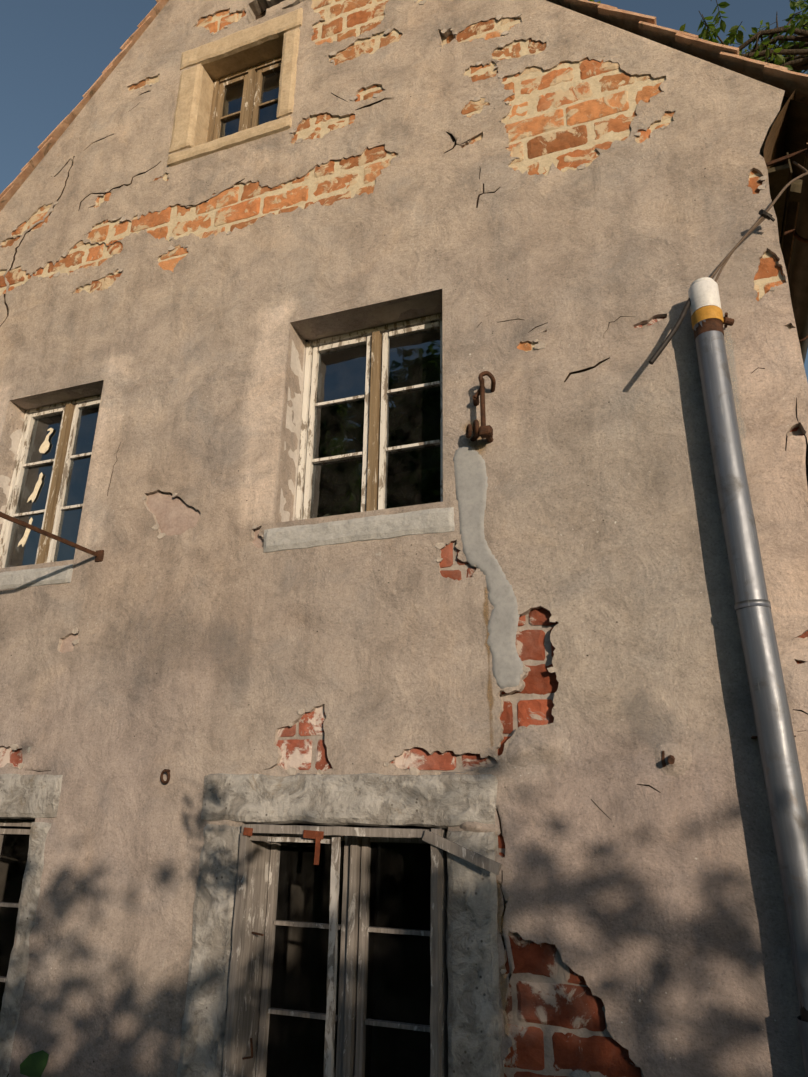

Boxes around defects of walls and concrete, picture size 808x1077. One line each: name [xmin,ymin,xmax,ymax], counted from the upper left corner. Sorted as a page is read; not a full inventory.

flaking render [193,0,403,66]
flaking render [438,14,676,176]
crack [0,133,161,327]
flaking render [0,144,399,296]
flaking render [746,168,767,194]
flaking render [753,248,787,301]
crack [779,397,808,507]
flaking render [435,540,477,581]
flaking render [0,744,24,770]
flaking render [264,704,332,775]
flaking render [384,606,559,776]
flaking render [500,931,645,1077]